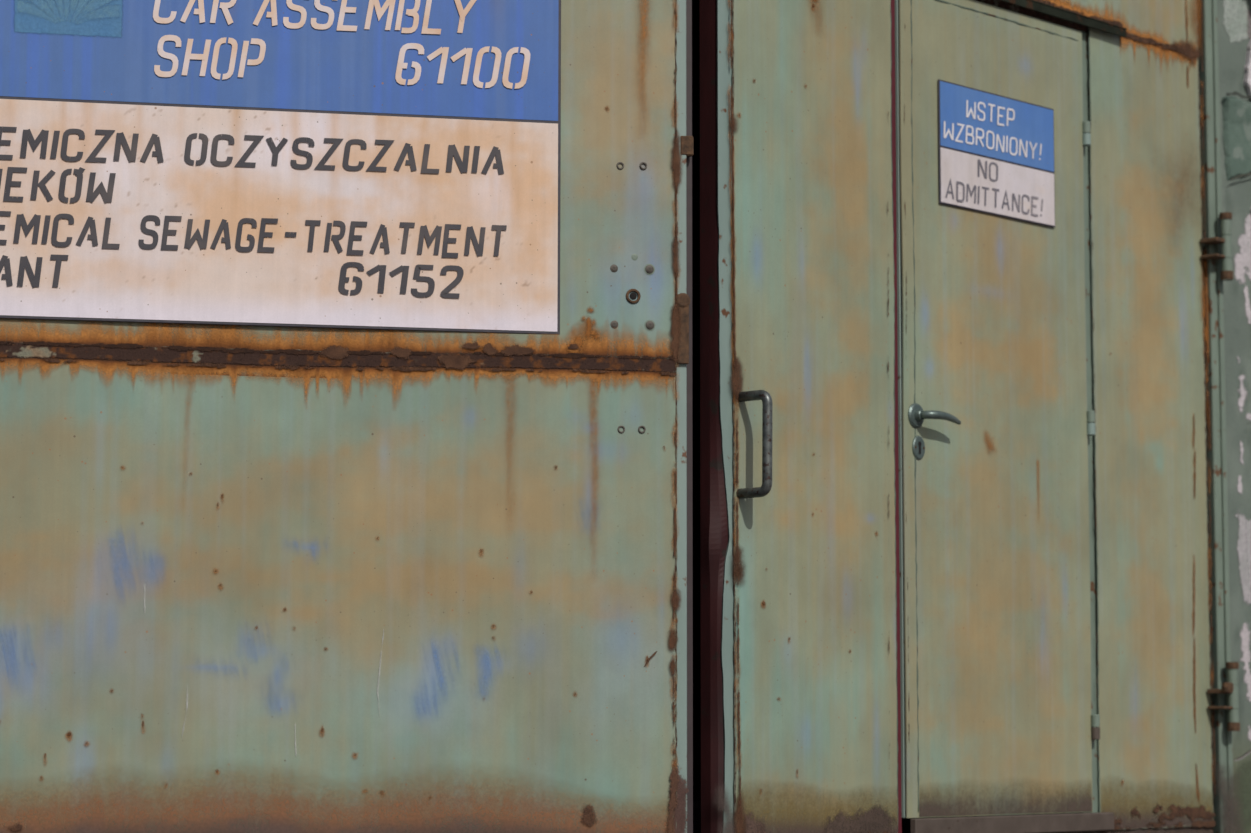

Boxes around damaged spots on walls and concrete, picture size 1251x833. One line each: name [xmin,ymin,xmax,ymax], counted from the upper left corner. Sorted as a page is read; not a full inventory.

corrosion [1035,0,1204,149]
peeling [1222,0,1251,43]
corrosion [0,69,682,416]
corrosion [730,87,743,402]
peeling [1234,213,1251,324]
peeling [1237,357,1251,420]
corrosion [668,508,681,723]
peeling [1236,513,1251,605]
peeling [1240,623,1251,701]
corrosion [0,741,689,833]
corrosion [735,692,898,833]
corrosion [1101,702,1216,833]